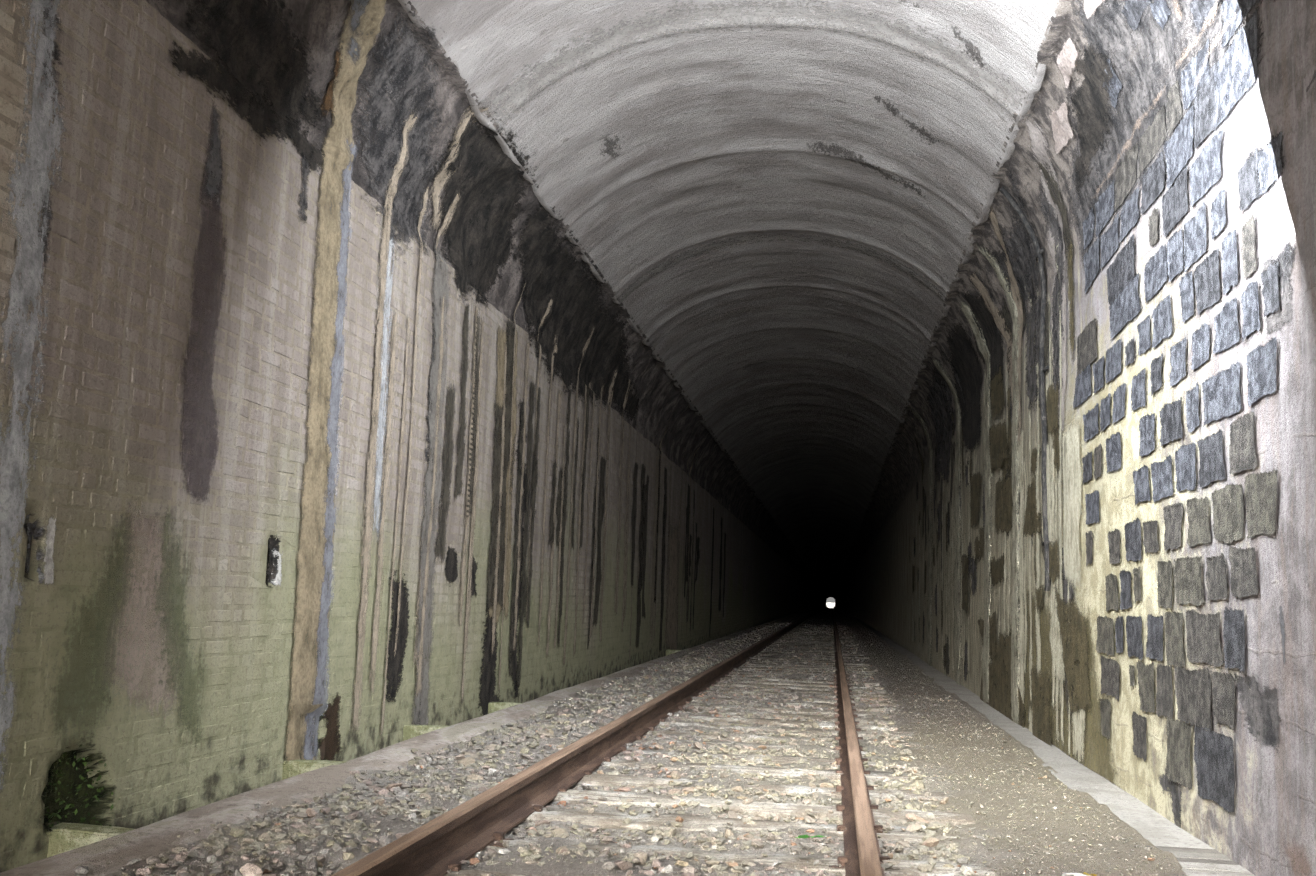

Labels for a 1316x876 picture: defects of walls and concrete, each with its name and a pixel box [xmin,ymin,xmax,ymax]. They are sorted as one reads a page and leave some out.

leakage [0,0,66,790]
leakage [181,107,226,501]
leakage [185,0,329,136]
leakage [298,155,311,223]
corrosion [317,51,341,117]
leakage [317,0,1085,764]
peeling [909,0,1296,813]